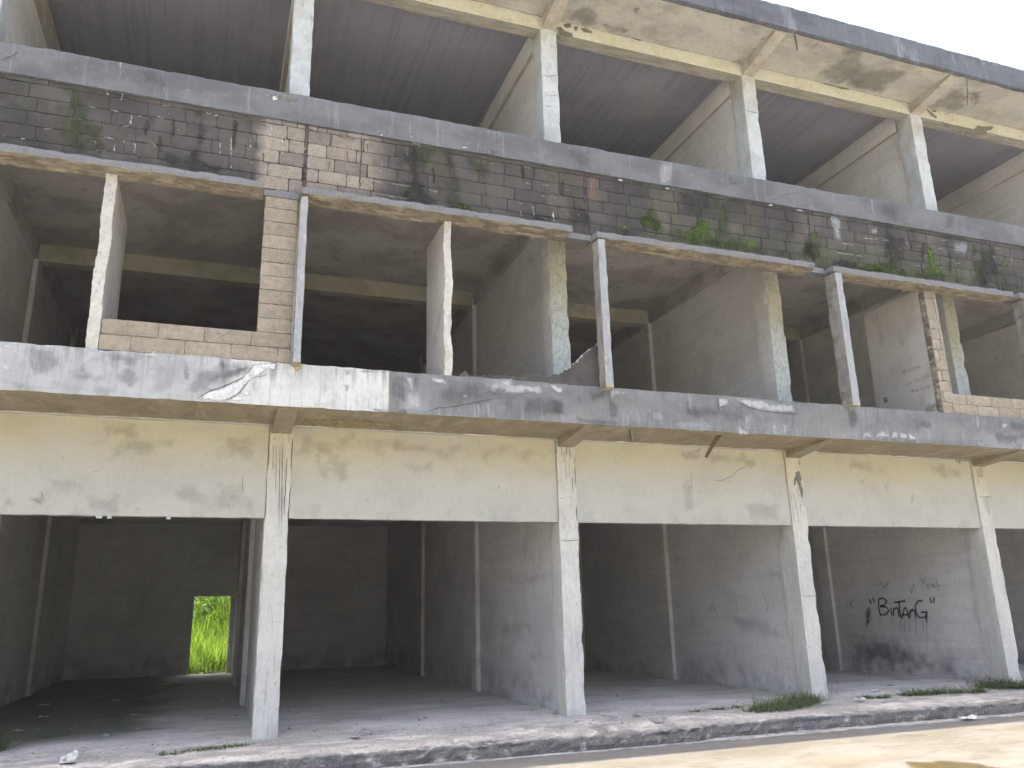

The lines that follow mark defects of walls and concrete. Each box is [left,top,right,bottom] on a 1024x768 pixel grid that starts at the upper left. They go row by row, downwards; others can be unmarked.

peeling [557,23,592,44]
water stain [71,93,247,171]
spalling [202,364,275,401]
crack [389,375,496,427]
spalling [794,472,804,504]